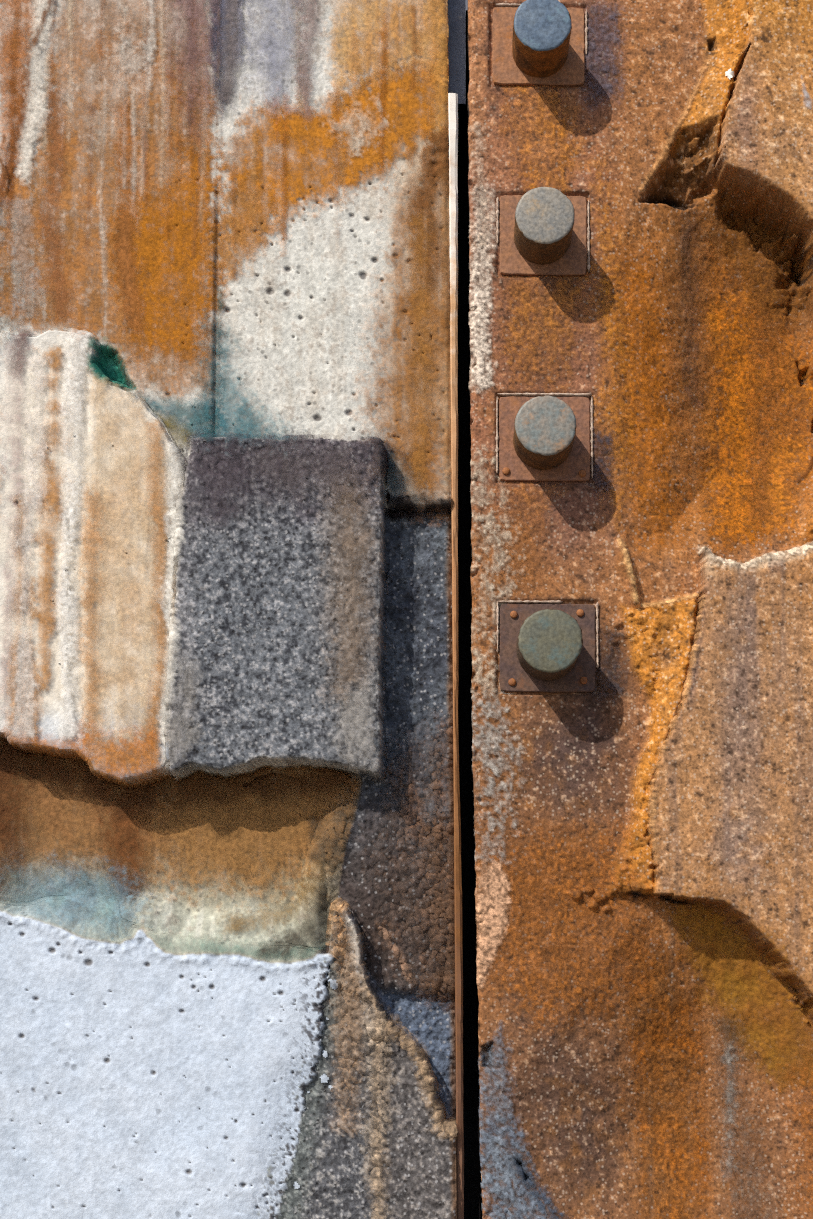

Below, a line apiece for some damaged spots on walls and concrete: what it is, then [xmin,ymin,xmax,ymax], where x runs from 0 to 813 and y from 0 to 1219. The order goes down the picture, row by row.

corrosion [0,347,357,902]
corrosion [0,0,452,503]
corrosion [506,483,551,582]
corrosion [497,275,583,393]
corrosion [501,85,583,193]
corrosion [600,167,813,559]
spalling [618,0,813,853]
peeling [0,507,457,1219]
spalling [481,900,813,1219]
corrosion [490,820,813,1219]